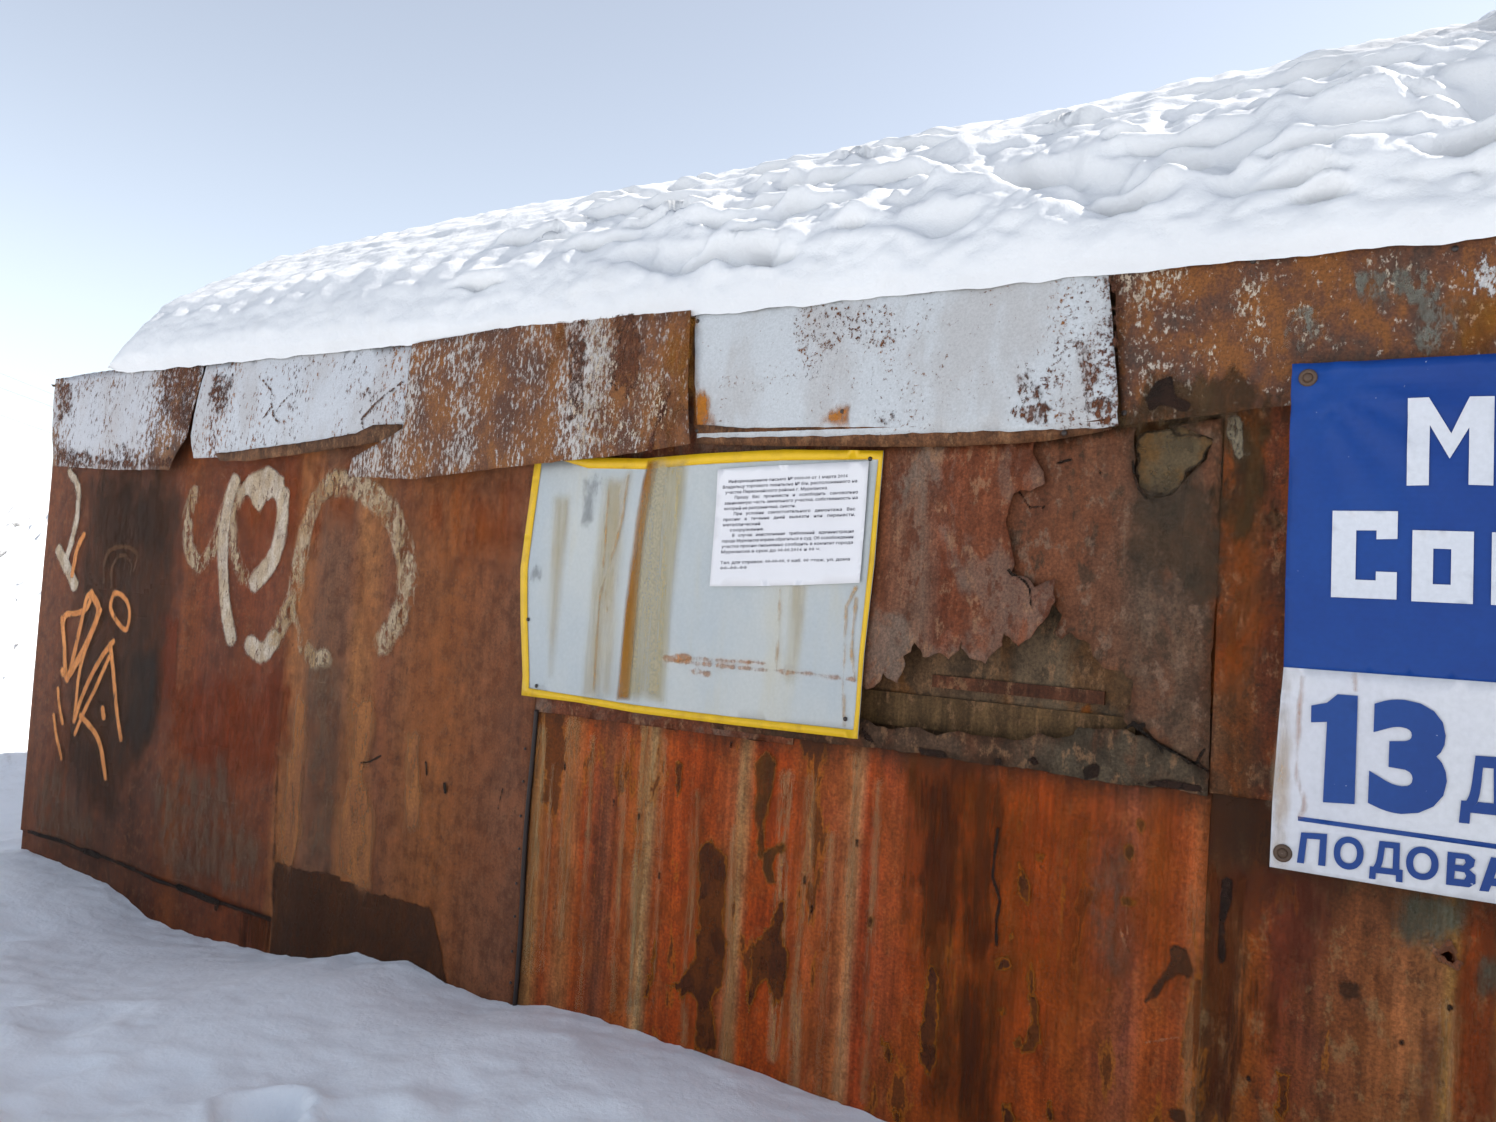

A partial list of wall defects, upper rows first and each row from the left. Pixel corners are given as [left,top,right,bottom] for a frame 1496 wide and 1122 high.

rust [558,319,588,422]
rust [606,313,643,398]
rust [281,694,307,869]
rust [336,699,376,891]
rust [404,731,421,830]
rust [1083,763,1100,780]
rust [1138,779,1202,793]
rust [617,728,859,1087]
rust [909,758,1045,1076]
rust [960,983,1015,1122]
rust [1144,865,1245,1122]
rust [1339,982,1359,1000]